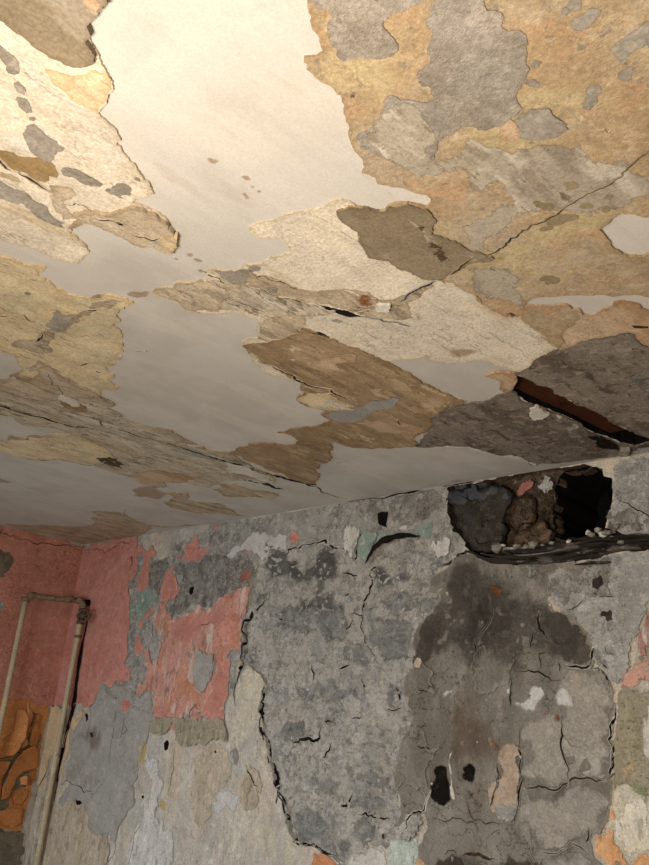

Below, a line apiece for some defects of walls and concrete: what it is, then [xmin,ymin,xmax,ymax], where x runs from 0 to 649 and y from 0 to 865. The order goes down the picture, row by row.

peeling [0,0,649,499]
crack [250,150,649,327]
crack [233,588,346,865]
spalling [0,456,649,865]
crack [269,531,419,666]
crack [442,550,509,567]
crack [397,610,617,865]
damp [516,686,544,710]
damp [556,688,573,706]